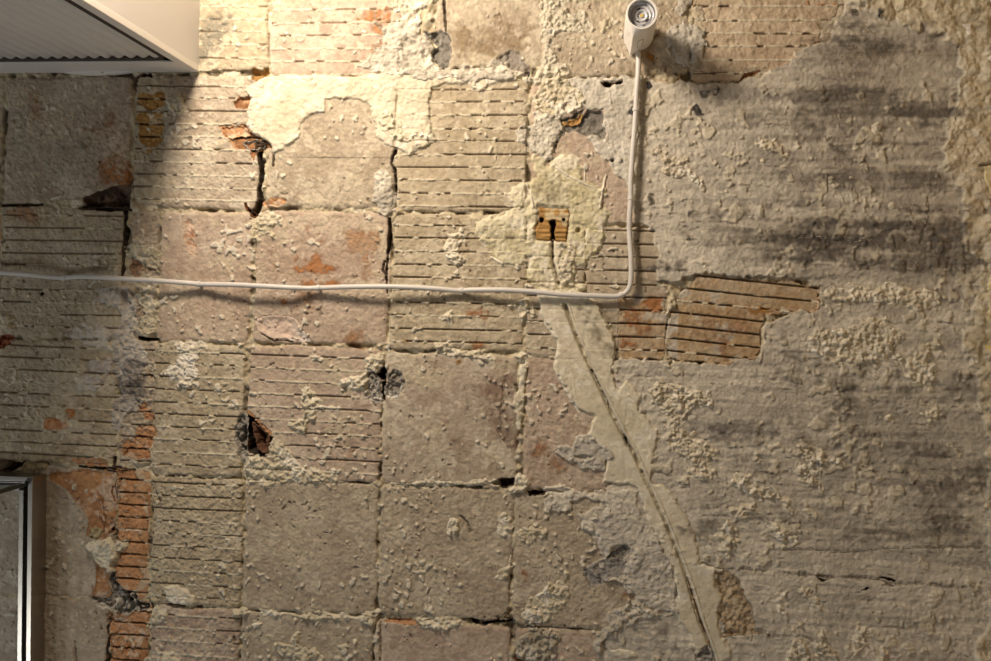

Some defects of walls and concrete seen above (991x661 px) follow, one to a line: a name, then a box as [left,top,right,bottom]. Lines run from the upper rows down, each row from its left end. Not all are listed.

spalling [662,0,838,84]
spalling [135,91,166,154]
peeling [219,0,644,186]
damp [797,86,962,131]
crack [244,140,275,218]
crack [382,149,398,294]
damp [766,204,986,273]
spalling [618,273,821,365]
spalling [47,397,157,598]
peeling [542,484,679,614]
spalling [109,610,148,661]
spalling [695,645,715,661]